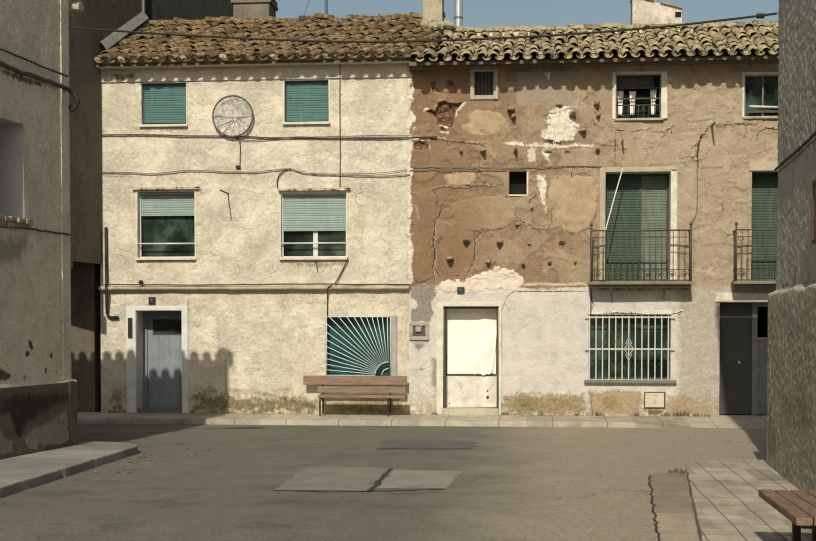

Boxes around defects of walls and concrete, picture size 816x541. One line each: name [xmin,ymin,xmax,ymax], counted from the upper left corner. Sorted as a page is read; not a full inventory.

crack [614,124,675,163]
crack [685,120,797,169]
flaking render [405,72,466,284]
crack [412,116,510,283]
crack [515,194,553,233]
crack [715,201,748,238]
flaking render [435,266,587,294]
water stain [0,394,68,437]